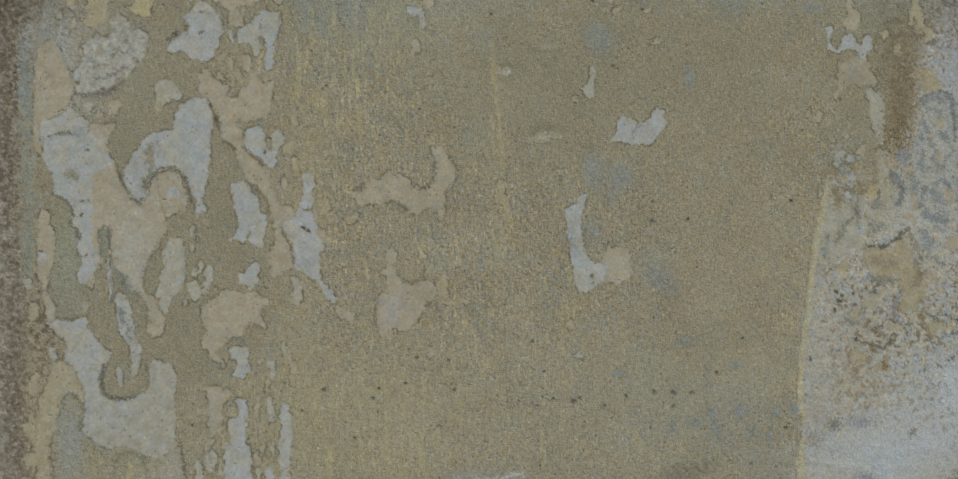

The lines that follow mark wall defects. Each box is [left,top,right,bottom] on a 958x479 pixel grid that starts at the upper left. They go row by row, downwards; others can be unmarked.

peeling [610,107,668,145]
peeling [21,0,471,479]
peeling [564,194,633,294]